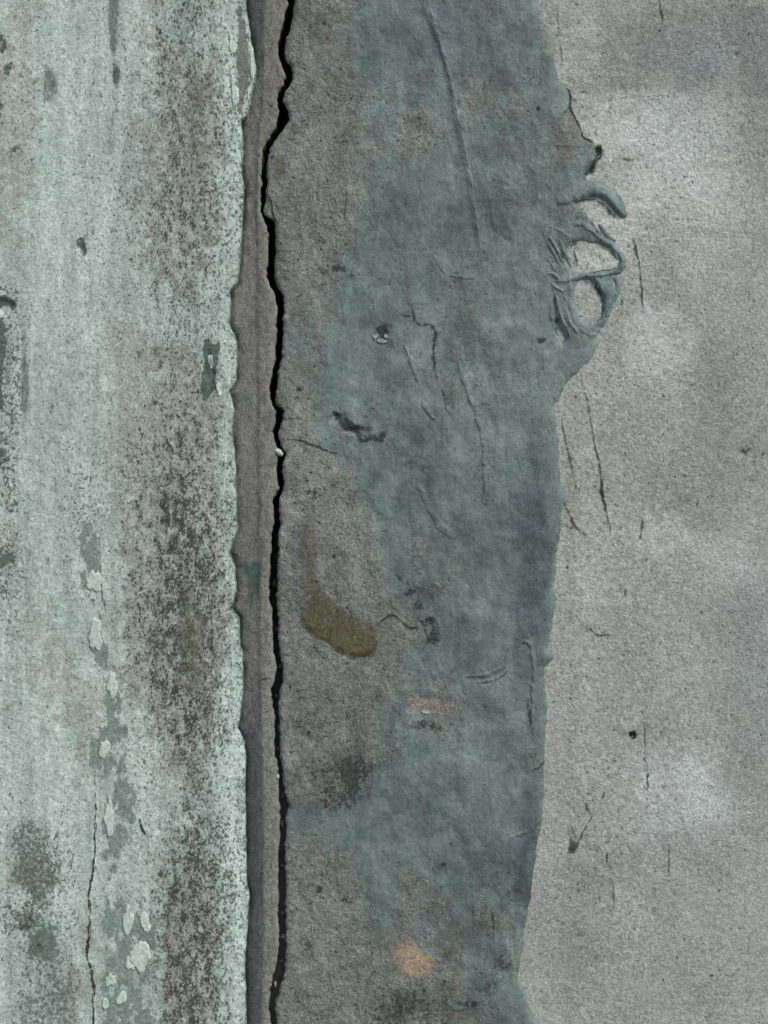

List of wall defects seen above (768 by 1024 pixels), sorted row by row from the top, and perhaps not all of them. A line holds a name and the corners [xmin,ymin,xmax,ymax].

spalling [584,144,602,175]
spalling [373,325,389,343]
spalling [330,411,385,442]
crack [260,0,338,1024]
damp [300,578,379,659]
spalling [395,573,440,646]
crack [86,776,97,1024]